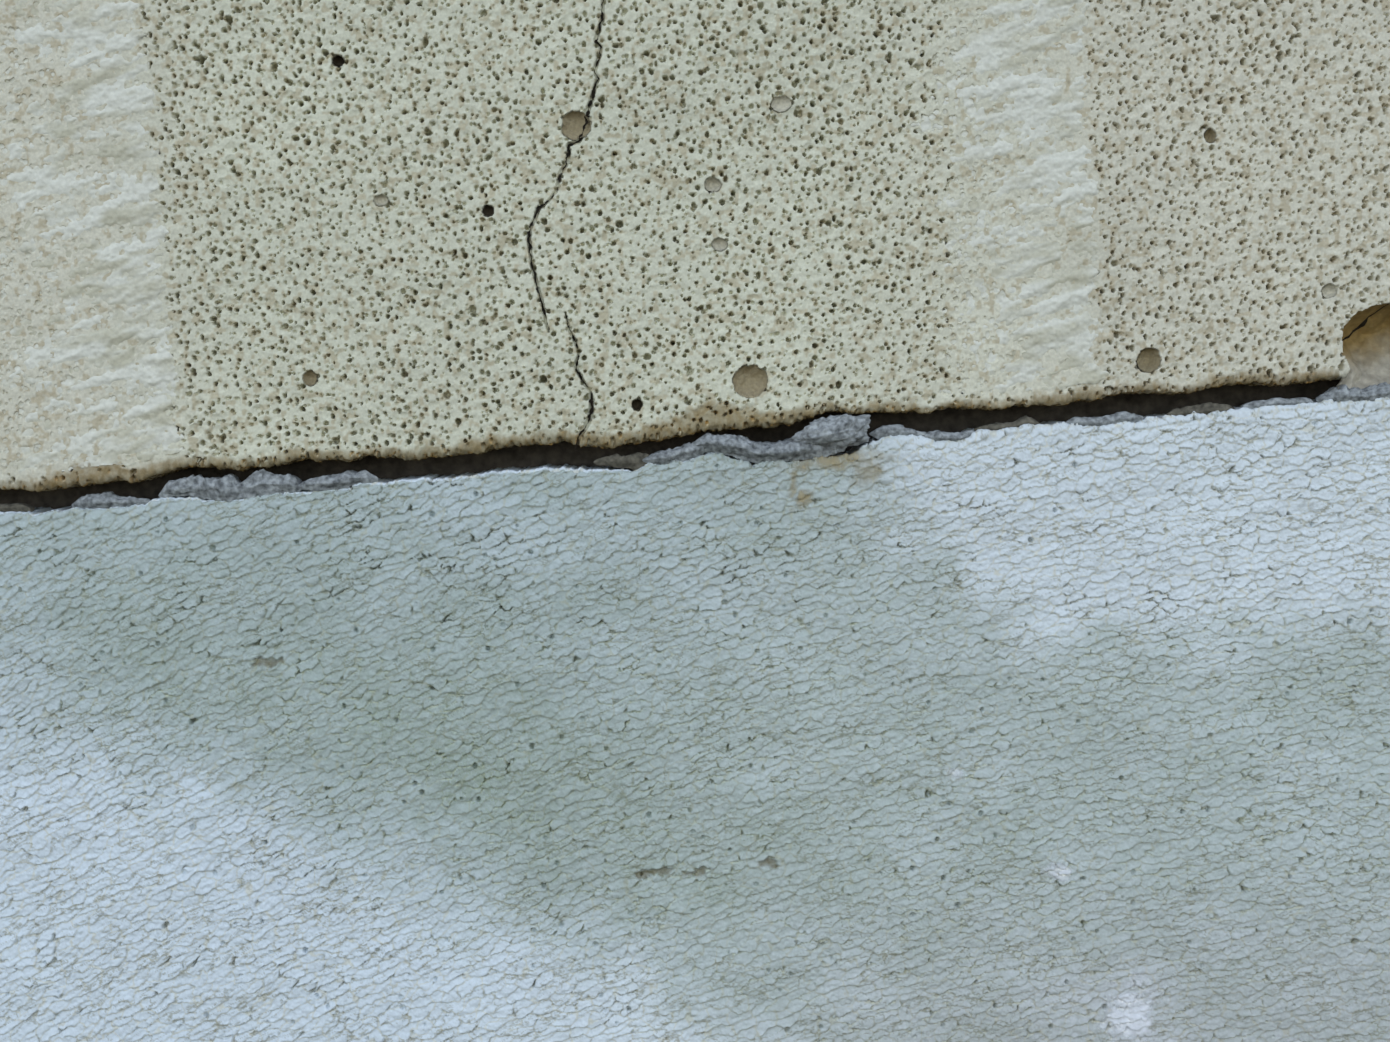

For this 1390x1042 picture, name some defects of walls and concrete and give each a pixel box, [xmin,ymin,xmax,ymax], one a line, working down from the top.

crack [527,0,604,450]